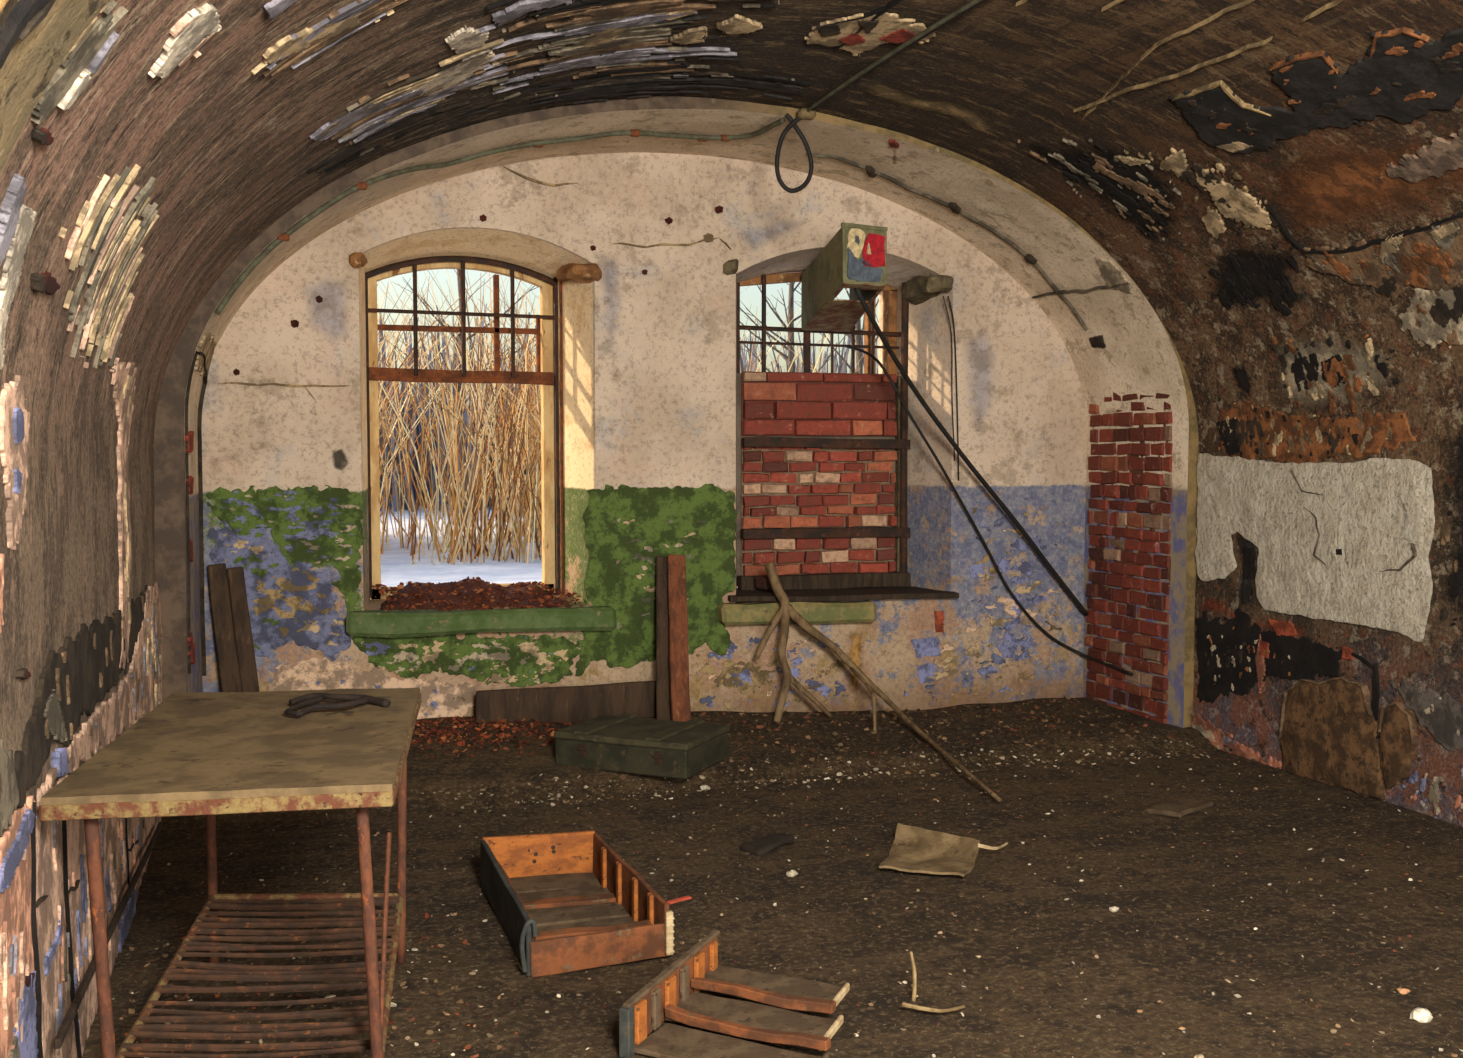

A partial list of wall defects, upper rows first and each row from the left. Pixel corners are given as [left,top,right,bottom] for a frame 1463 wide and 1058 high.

peeling [251,0,408,78]
peeling [306,0,812,174]
peeling [804,12,936,57]
flaking render [1114,27,1463,349]
peeling [0,164,162,1058]
peeling [185,329,860,719]
peeling [904,498,1063,701]
flaking render [1085,392,1173,724]
peeling [1191,712,1287,772]
flaking render [1388,678,1463,821]